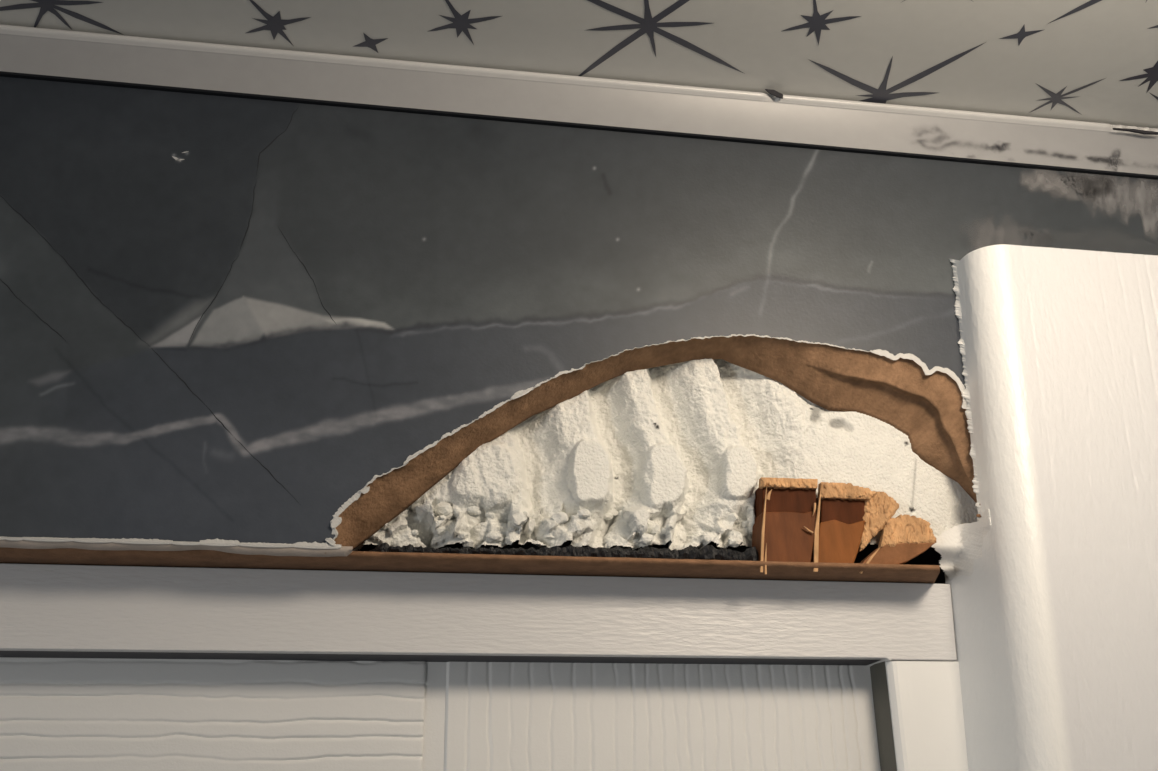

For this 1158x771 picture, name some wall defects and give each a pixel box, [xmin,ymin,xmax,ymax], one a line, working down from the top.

flaking render [325,259,991,581]